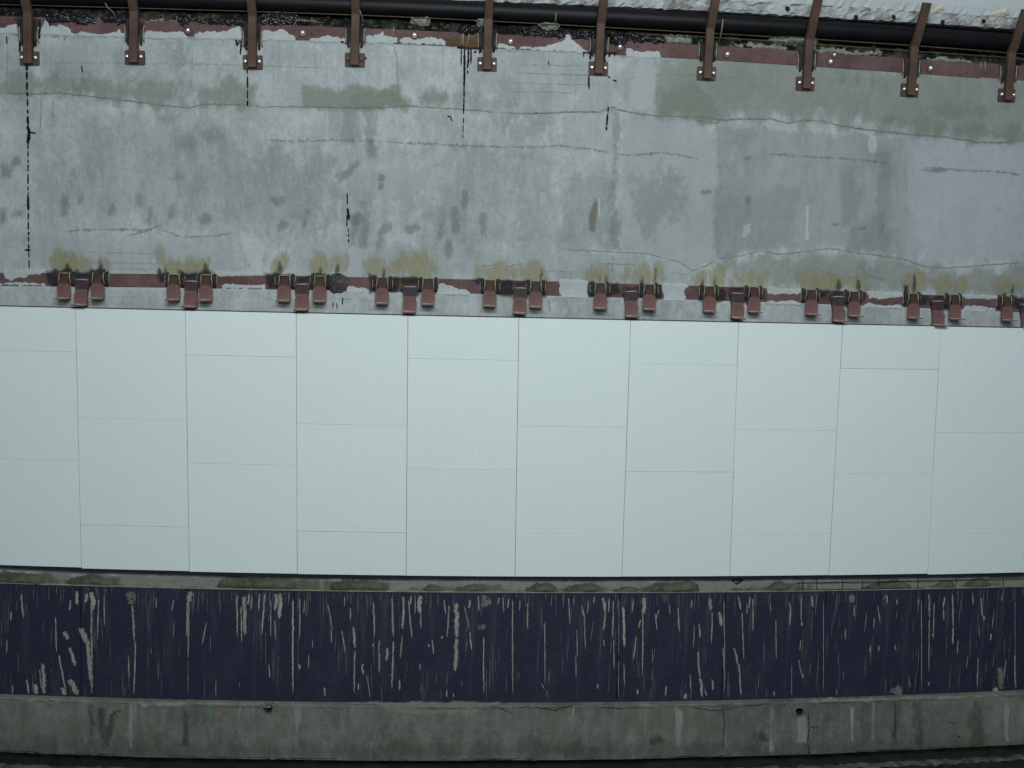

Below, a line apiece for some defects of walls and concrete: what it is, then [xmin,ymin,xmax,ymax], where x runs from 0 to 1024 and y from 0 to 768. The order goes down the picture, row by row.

crack [3,40,1022,144]
damp [476,260,544,281]
crack [565,247,1024,280]
damp [801,271,866,291]